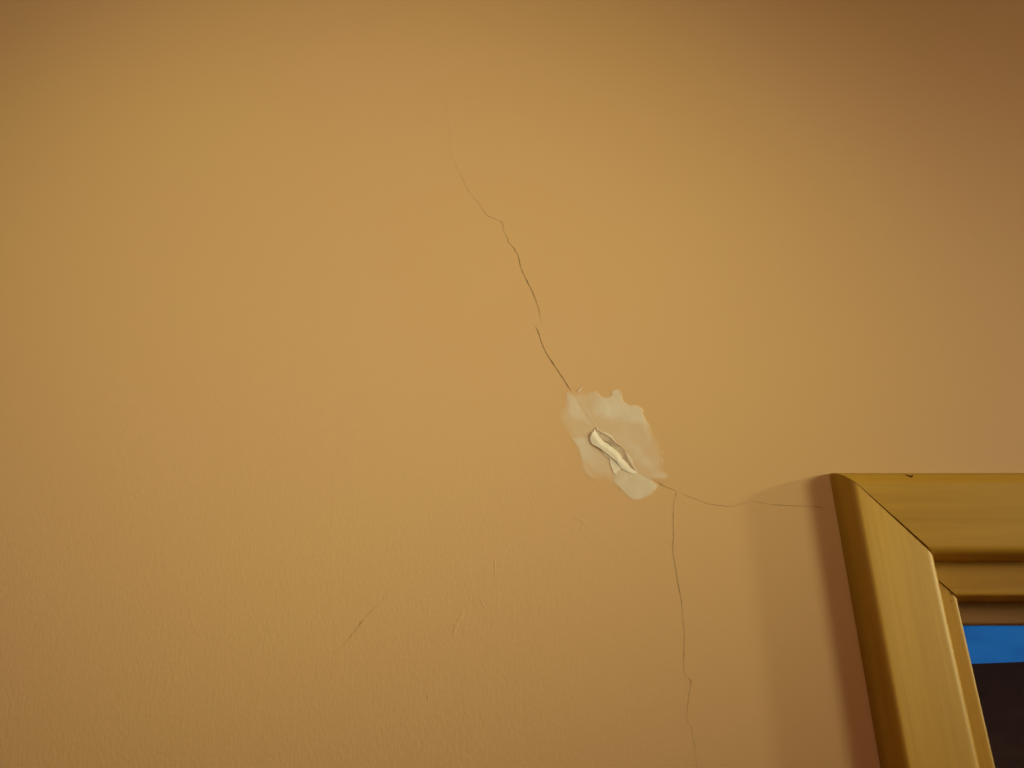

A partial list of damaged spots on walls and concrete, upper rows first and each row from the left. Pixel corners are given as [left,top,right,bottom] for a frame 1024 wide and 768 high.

spalling [590,426,637,475]